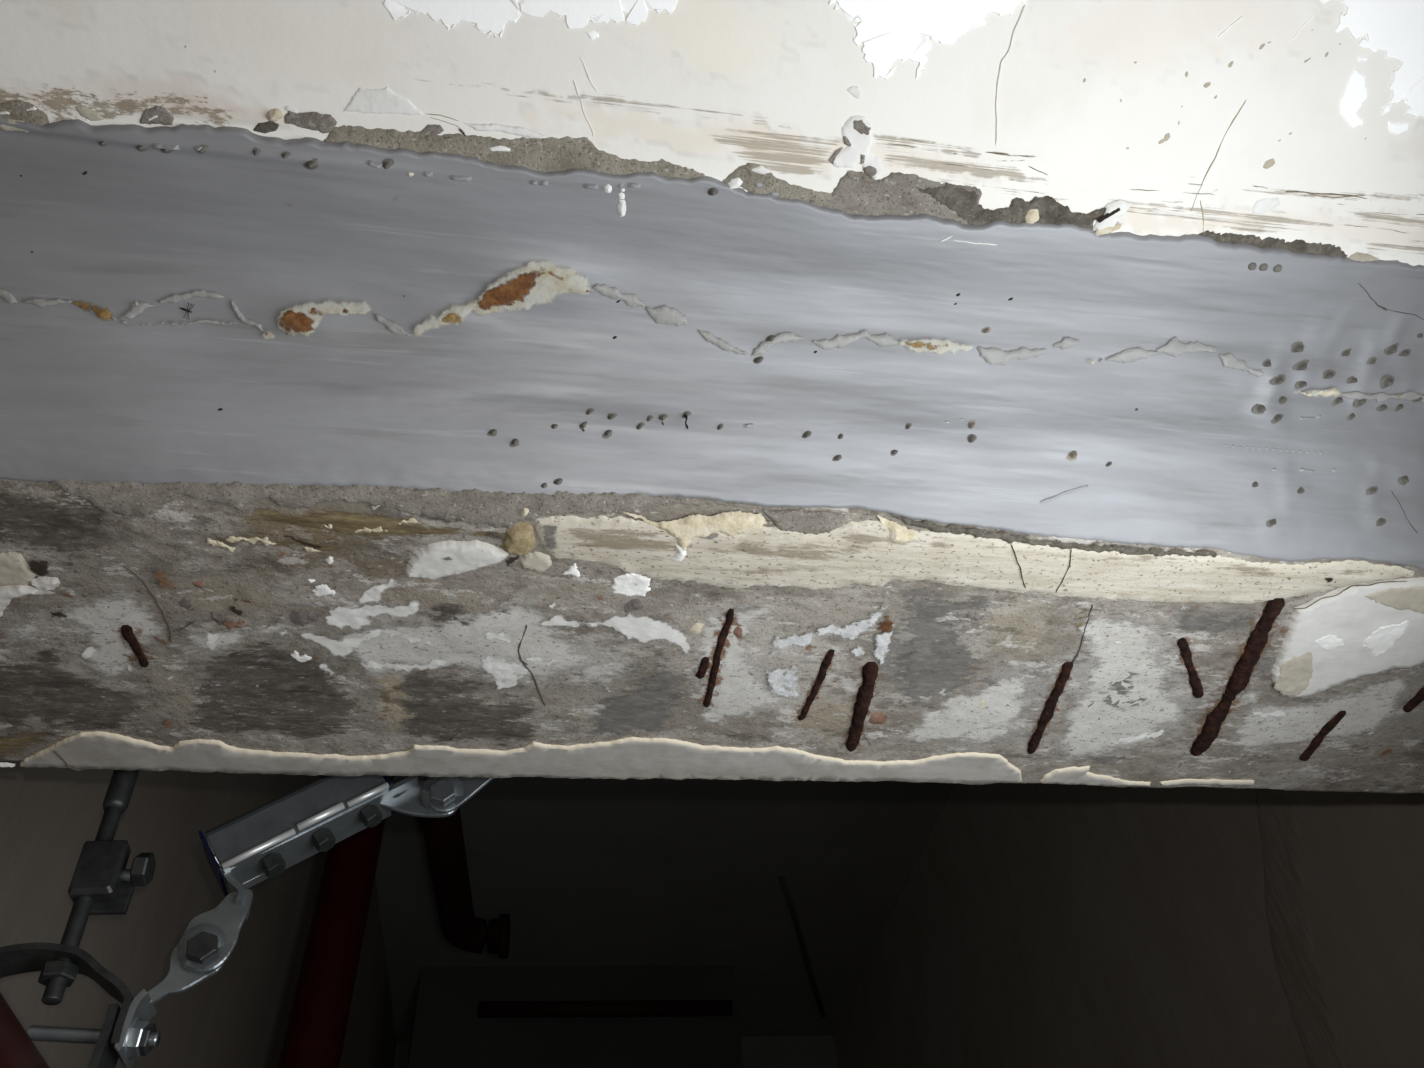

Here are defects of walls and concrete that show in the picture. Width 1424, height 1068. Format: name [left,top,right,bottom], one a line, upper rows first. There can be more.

spalling [324,87,705,179]
spalling [823,86,1131,236]
spalling [1198,230,1380,262]
rust [74,300,112,320]
rust [262,300,370,339]
rust [414,261,590,336]
spalling [877,514,1217,558]
damp [0,648,140,760]
damp [188,643,362,739]
damp [380,672,535,746]
peeling [540,573,743,707]
spalling [1177,598,1287,756]